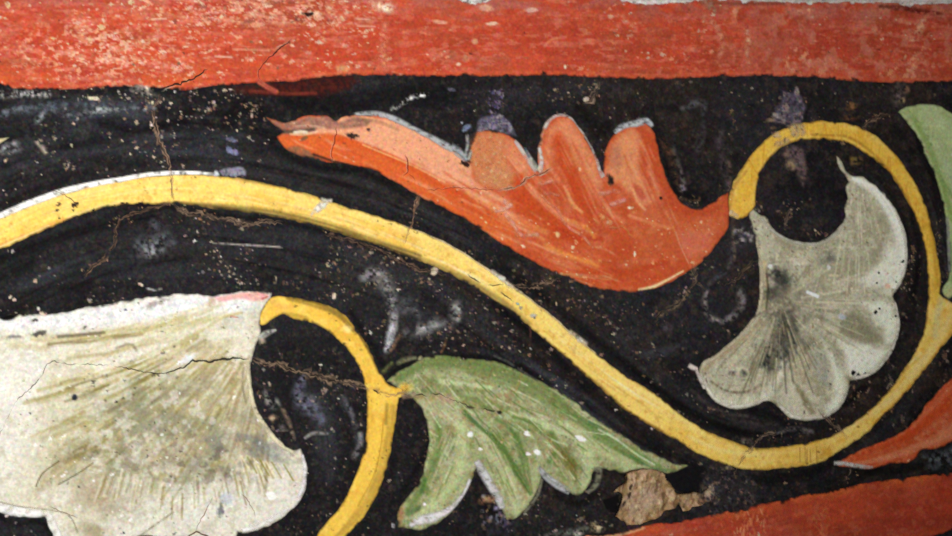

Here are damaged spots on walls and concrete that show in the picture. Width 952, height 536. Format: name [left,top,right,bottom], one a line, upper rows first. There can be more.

crack [153,71,204,197]
crack [19,357,494,412]
flaking render [603,466,755,526]